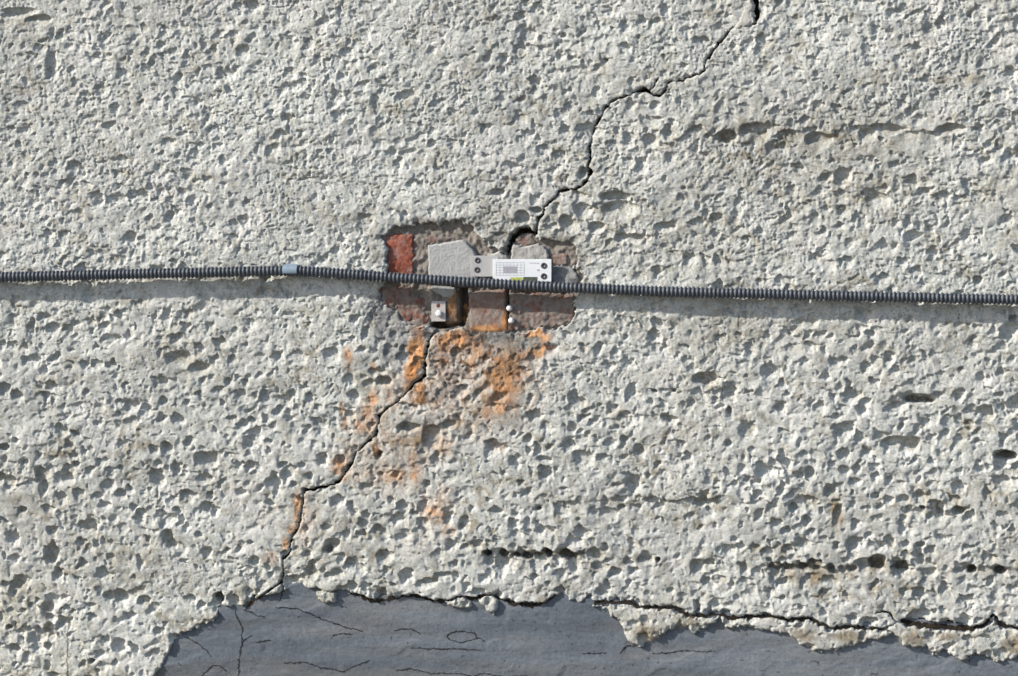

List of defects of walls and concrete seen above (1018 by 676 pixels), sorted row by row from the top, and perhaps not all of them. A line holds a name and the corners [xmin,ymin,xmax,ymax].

crack [508,0,760,254]
flaking render [379,220,584,337]
corrosion [405,303,506,399]
corrosion [522,328,551,357]
crack [186,326,449,676]
flaking render [316,590,337,603]
flaking render [445,595,498,615]
flaking render [593,604,1018,662]
crack [594,600,1018,632]